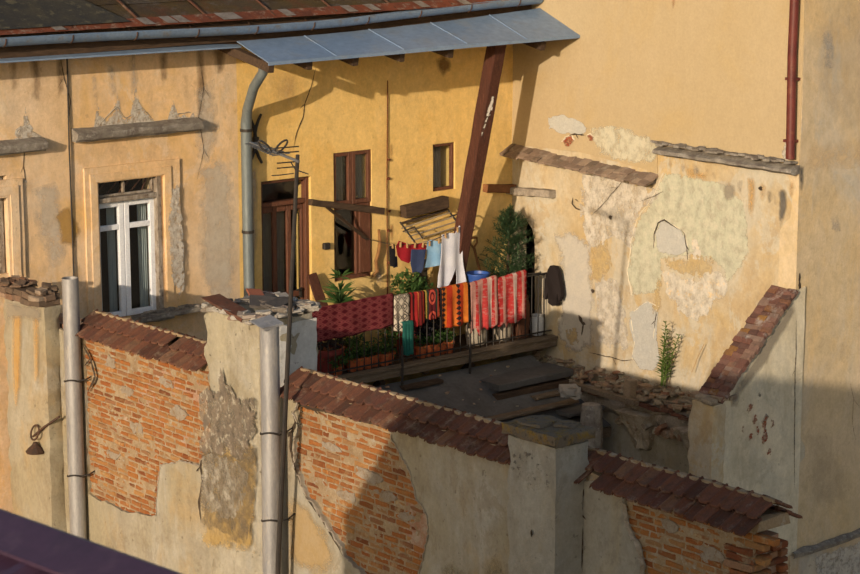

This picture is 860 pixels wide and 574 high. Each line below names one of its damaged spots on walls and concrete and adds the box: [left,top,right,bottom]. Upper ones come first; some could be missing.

flaking render [94,89,153,127]
crack [198,69,211,174]
crack [293,69,316,149]
peeling [548,115,657,163]
flaking render [168,185,185,295]
peeling [555,172,748,371]
flaking render [85,340,248,519]
flaking render [742,403,774,455]
flaking render [292,402,429,574]
flaking render [619,501,780,574]